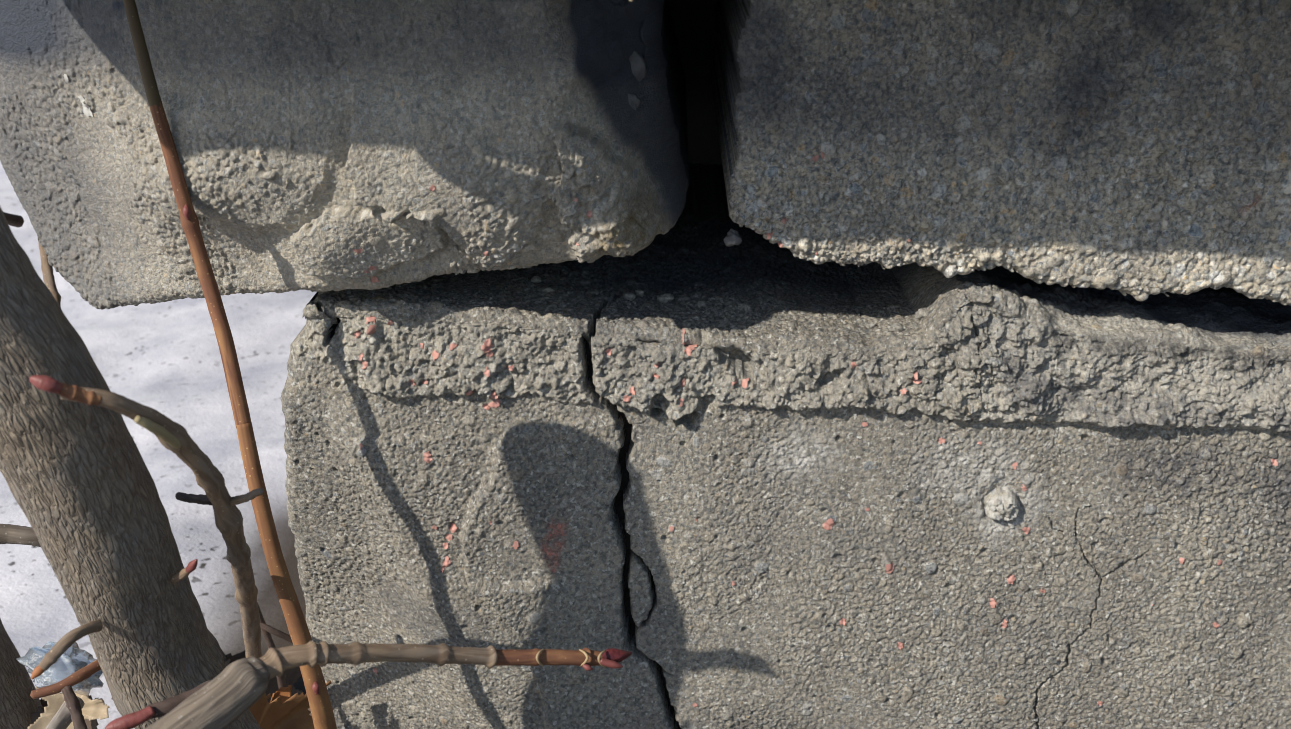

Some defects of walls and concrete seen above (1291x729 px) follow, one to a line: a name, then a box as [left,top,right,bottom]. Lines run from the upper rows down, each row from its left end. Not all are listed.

spalling [290,302,1002,428]
crack [584,331,655,638]
crack [653,661,682,729]